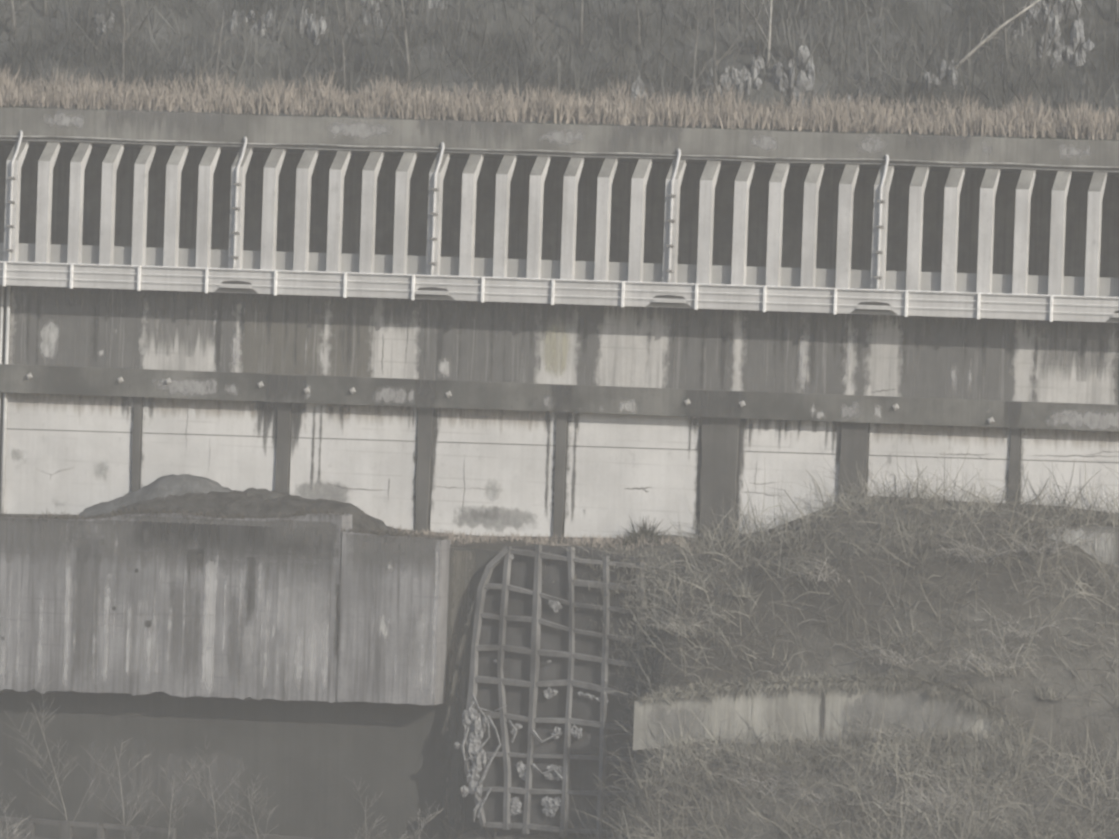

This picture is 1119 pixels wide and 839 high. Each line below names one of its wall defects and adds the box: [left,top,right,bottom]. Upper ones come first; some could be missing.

damp [12,285,621,519]
damp [636,306,876,527]
damp [890,315,1119,495]
damp [0,516,334,687]
damp [296,585,341,681]